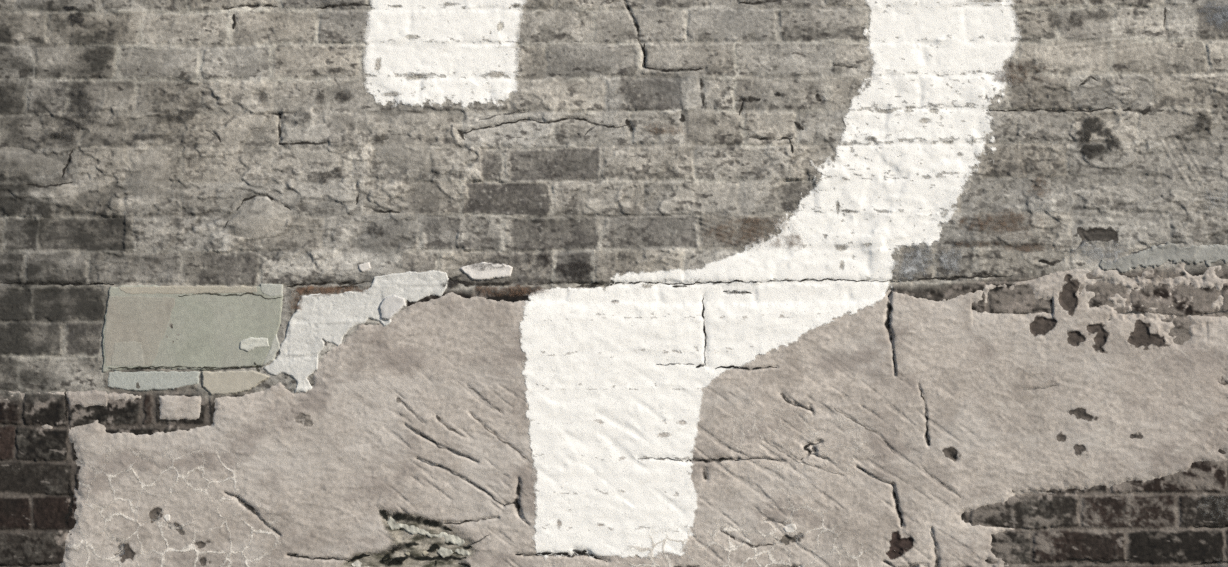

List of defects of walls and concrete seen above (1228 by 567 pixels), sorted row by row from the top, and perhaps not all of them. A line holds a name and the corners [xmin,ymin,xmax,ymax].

crack [609,0,705,122]
crack [458,111,633,140]
crack [736,92,822,153]
crack [178,281,371,299]
peeling [240,262,513,393]
spalling [1030,274,1109,353]
spalling [1128,319,1169,350]
crack [448,270,1012,567]
spalling [1069,408,1098,421]
crack [397,386,528,546]
spalling [942,447,961,461]
spalling [343,509,475,567]